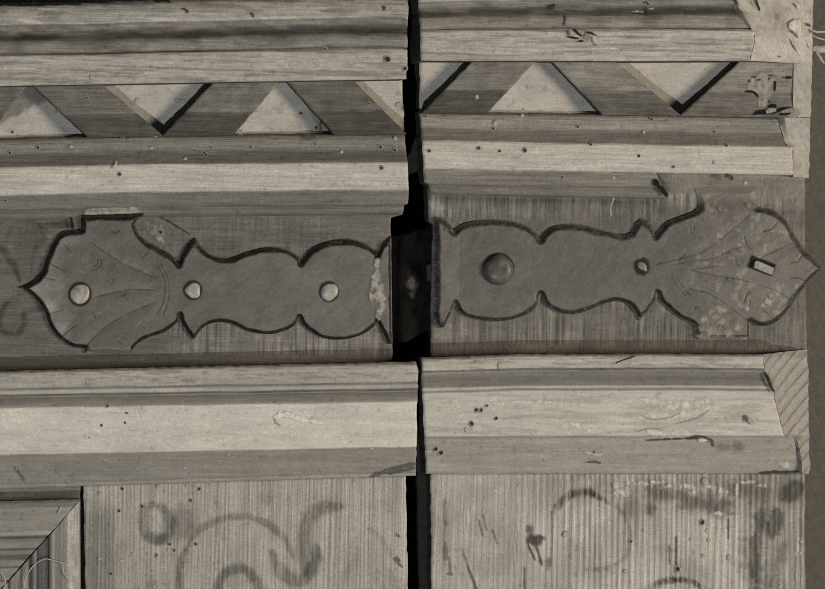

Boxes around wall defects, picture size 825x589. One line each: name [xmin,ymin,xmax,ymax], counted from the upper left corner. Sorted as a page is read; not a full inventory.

peeling [789,19,812,55]
damp [684,496,732,539]
damp [755,481,804,538]